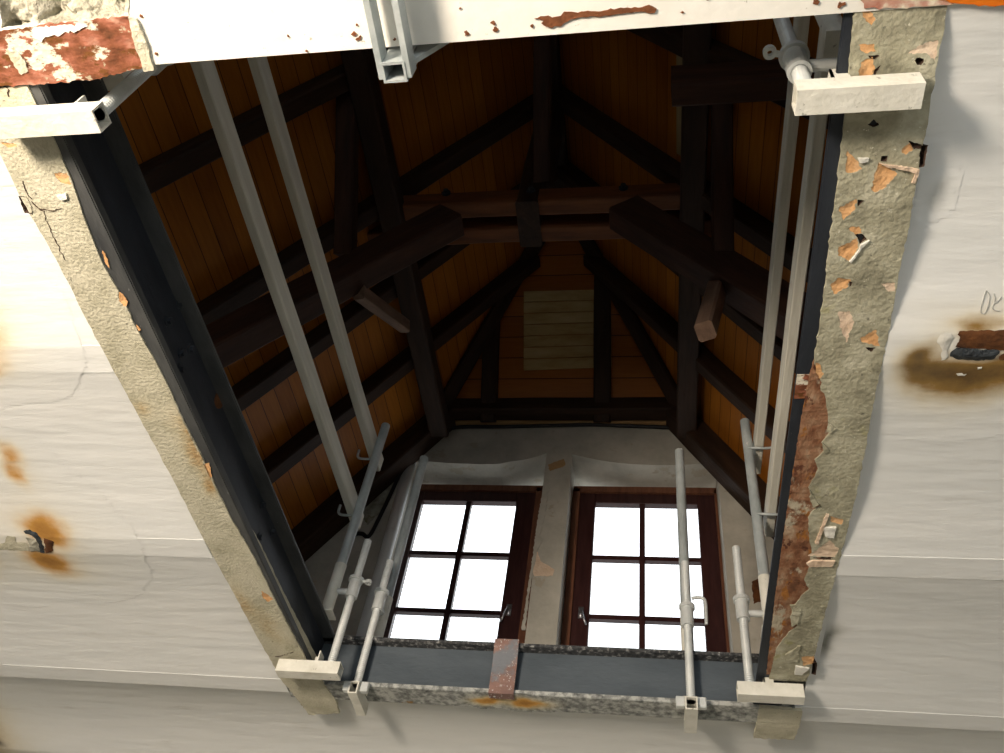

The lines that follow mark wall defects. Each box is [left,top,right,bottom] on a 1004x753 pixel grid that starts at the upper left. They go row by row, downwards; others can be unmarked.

spalling [0,0,130,28]
rust [530,5,657,28]
spalling [858,44,881,76]
spalling [907,40,939,65]
spalling [845,141,928,192]
crack [19,181,65,260]
spalling [838,199,869,263]
spalling [838,311,880,352]
rust [956,330,1004,360]
rust [0,412,153,608]
rust [766,360,836,674]
peeling [0,536,29,551]